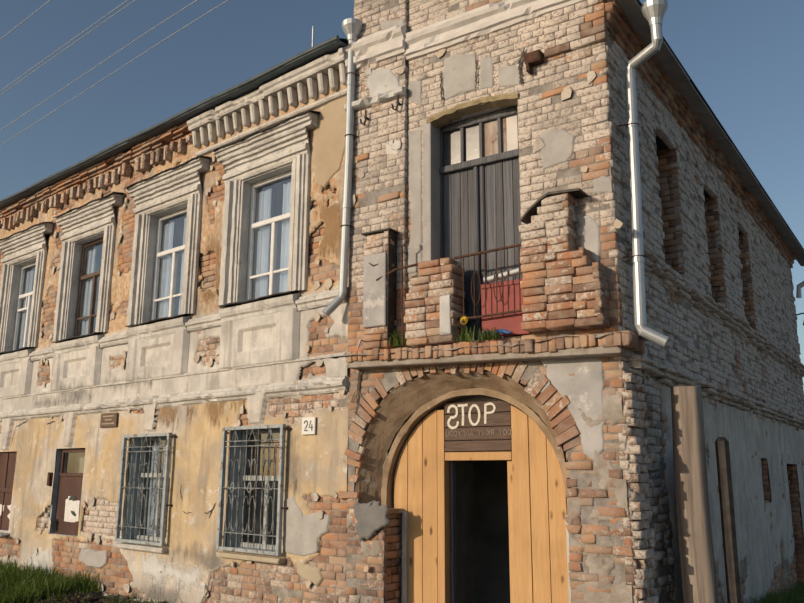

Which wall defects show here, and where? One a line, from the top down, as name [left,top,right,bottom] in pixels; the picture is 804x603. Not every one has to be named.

flaking render [205,152,225,224]
flaking render [101,163,159,276]
flaking render [308,248,349,290]
flaking render [108,297,129,328]
flaking render [37,358,51,387]
flaking render [109,350,126,370]
flaking render [189,330,220,367]
flaking render [269,313,350,424]
flaking render [0,536,38,567]
flaking render [36,497,150,601]
flaking render [204,481,348,603]